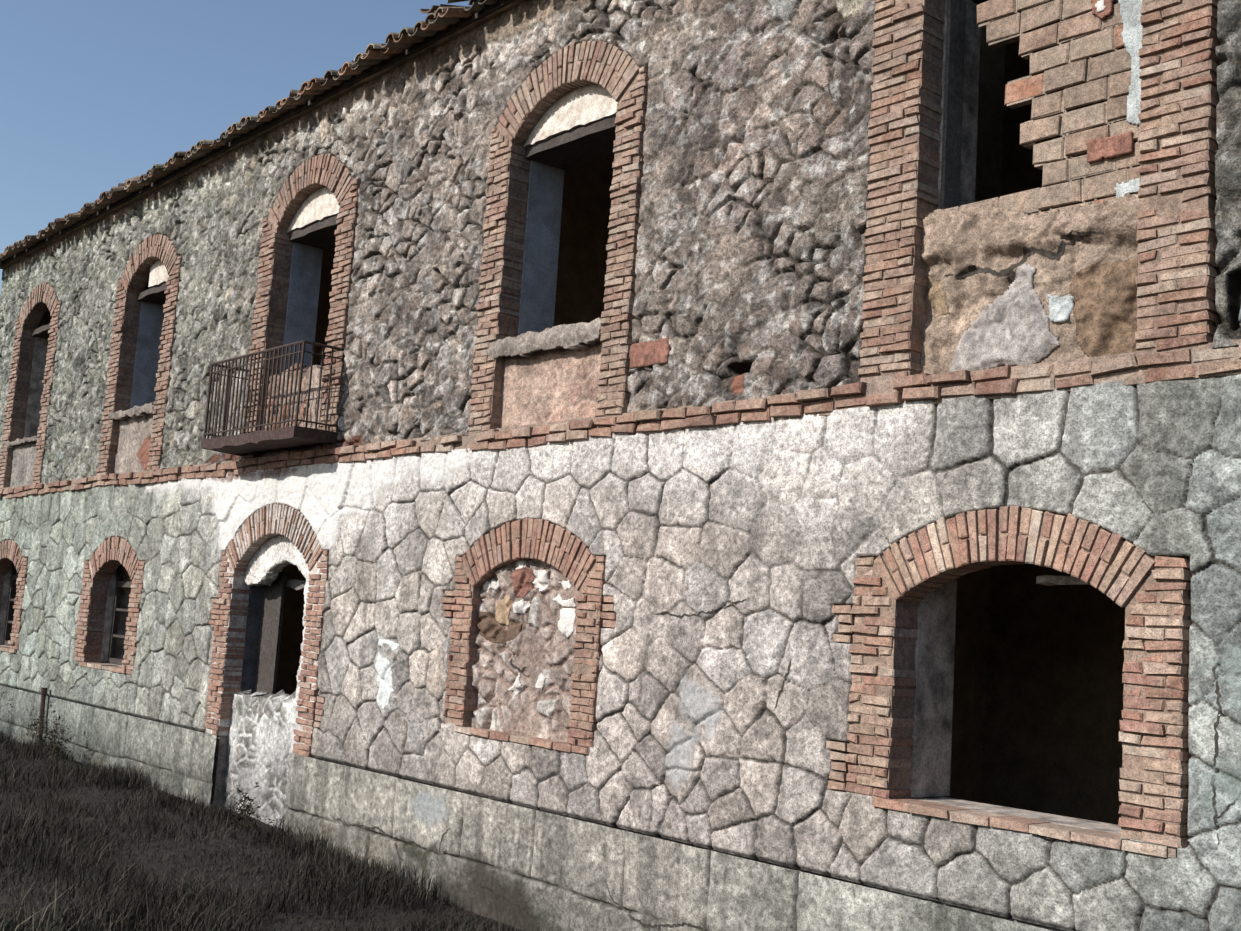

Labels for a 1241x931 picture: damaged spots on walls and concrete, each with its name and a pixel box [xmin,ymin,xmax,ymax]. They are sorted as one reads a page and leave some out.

flaking render [1086,0,1142,163]
crack [945,230,1104,290]
flaking render [1114,178,1140,198]
crack [1210,660,1237,850]